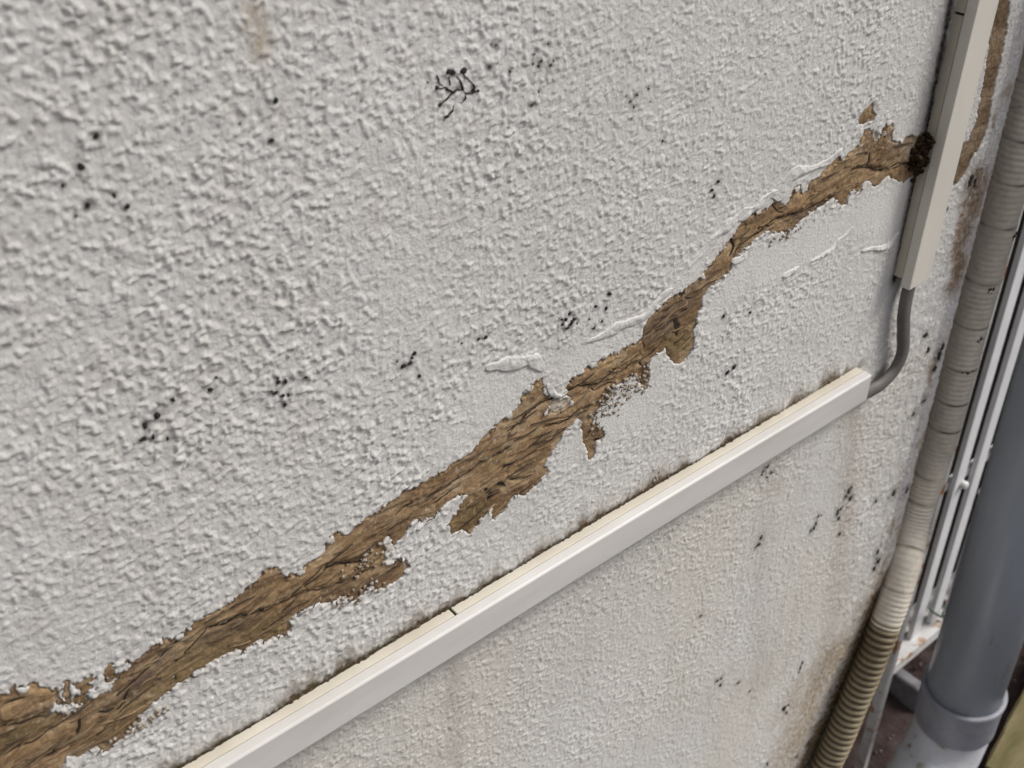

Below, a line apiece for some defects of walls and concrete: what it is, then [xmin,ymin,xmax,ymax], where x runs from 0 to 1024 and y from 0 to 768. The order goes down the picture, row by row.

spalling [953,0,1010,185]
spalling [0,103,922,768]